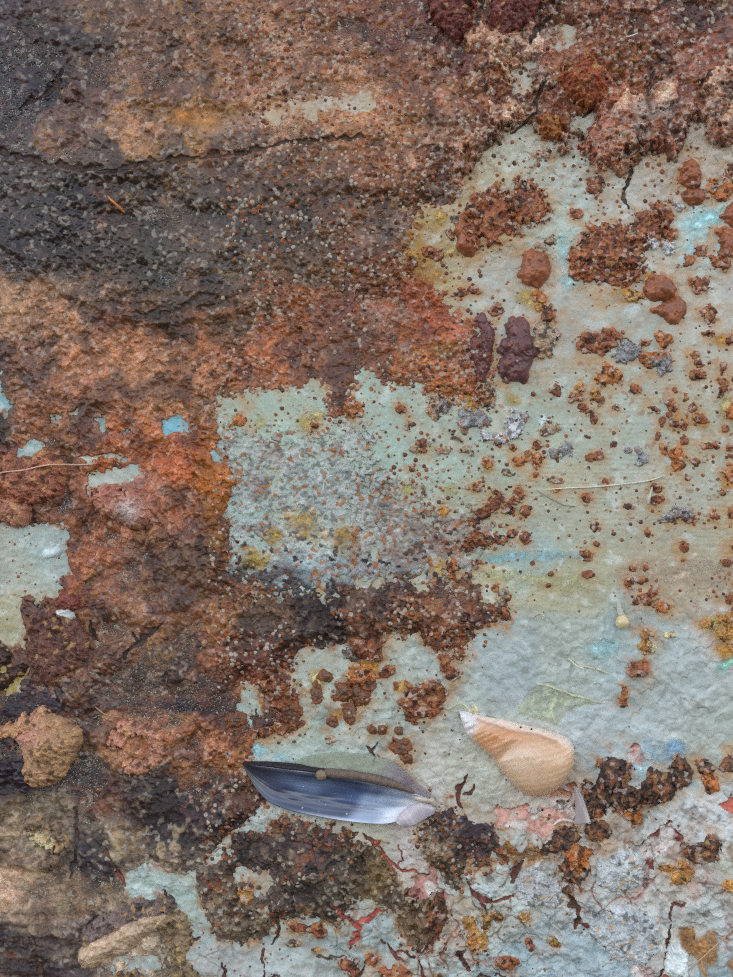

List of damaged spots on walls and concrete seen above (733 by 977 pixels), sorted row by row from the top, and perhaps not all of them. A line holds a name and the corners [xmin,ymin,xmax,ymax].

crack [0,133,364,172]
corrosion [0,0,733,419]
corrosion [0,273,503,977]
crack [260,913,281,977]
crack [305,832,431,877]
crack [316,903,445,977]
crack [455,949,506,977]
corrosion [416,807,548,891]
crack [467,860,524,911]
crack [567,895,589,930]
crack [659,902,686,977]